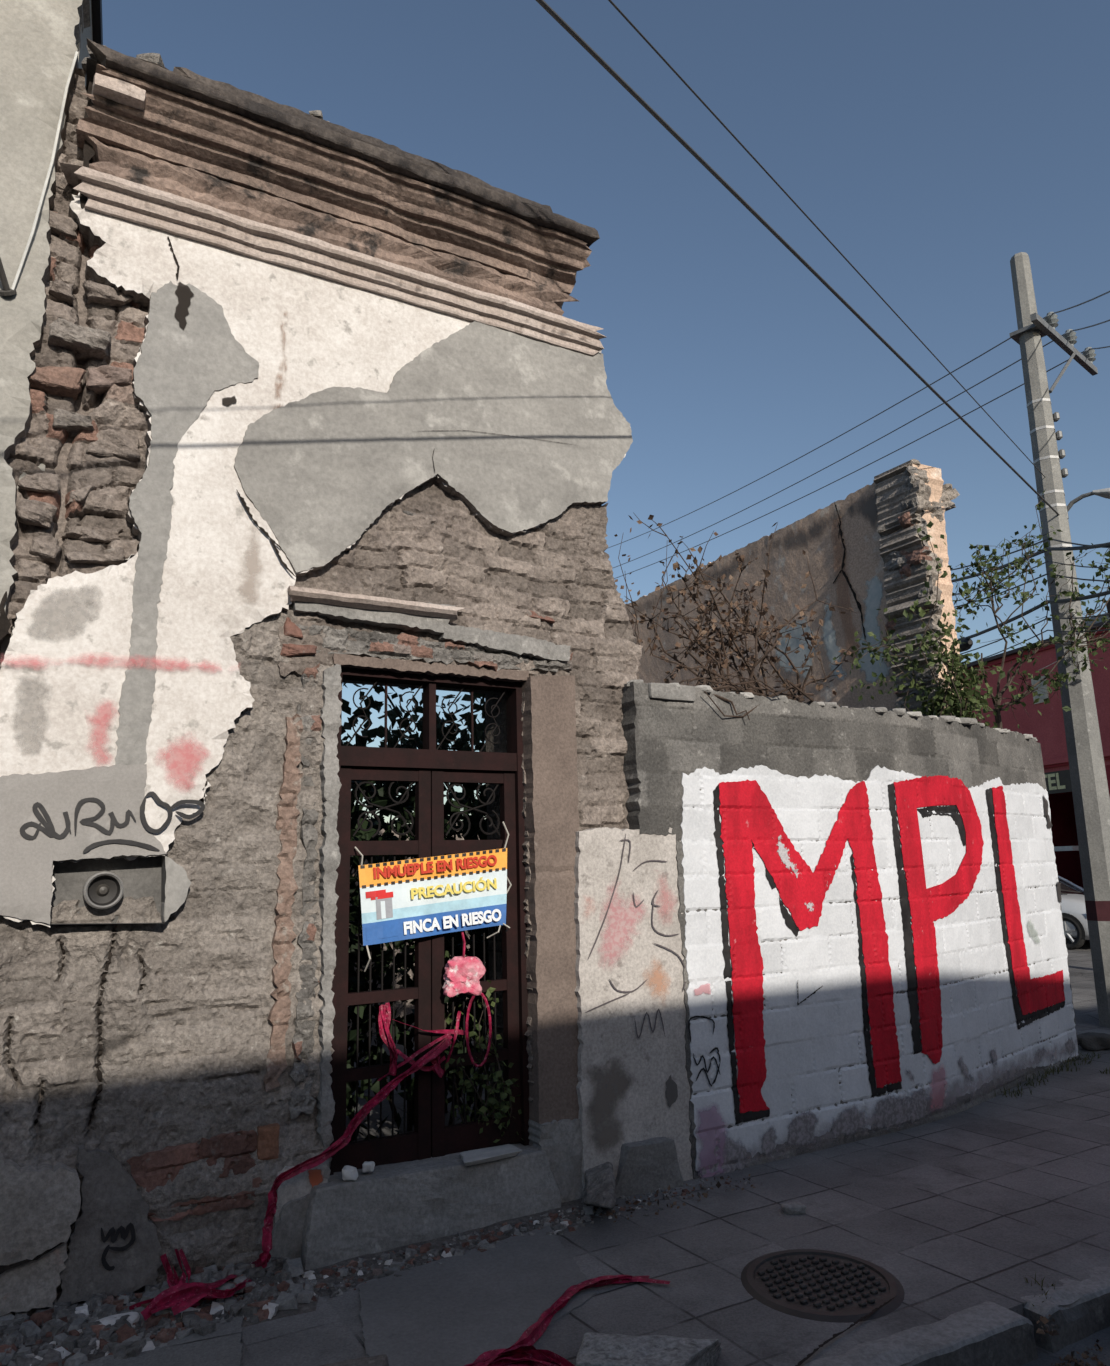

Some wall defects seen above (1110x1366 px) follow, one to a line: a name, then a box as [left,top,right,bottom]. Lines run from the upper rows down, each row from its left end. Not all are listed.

spalling [1,67,148,645]
crack [833,501,866,642]
crack [7,1021,44,1123]
crack [58,941,66,978]
crack [88,934,147,1126]
spalling [0,479,643,1317]